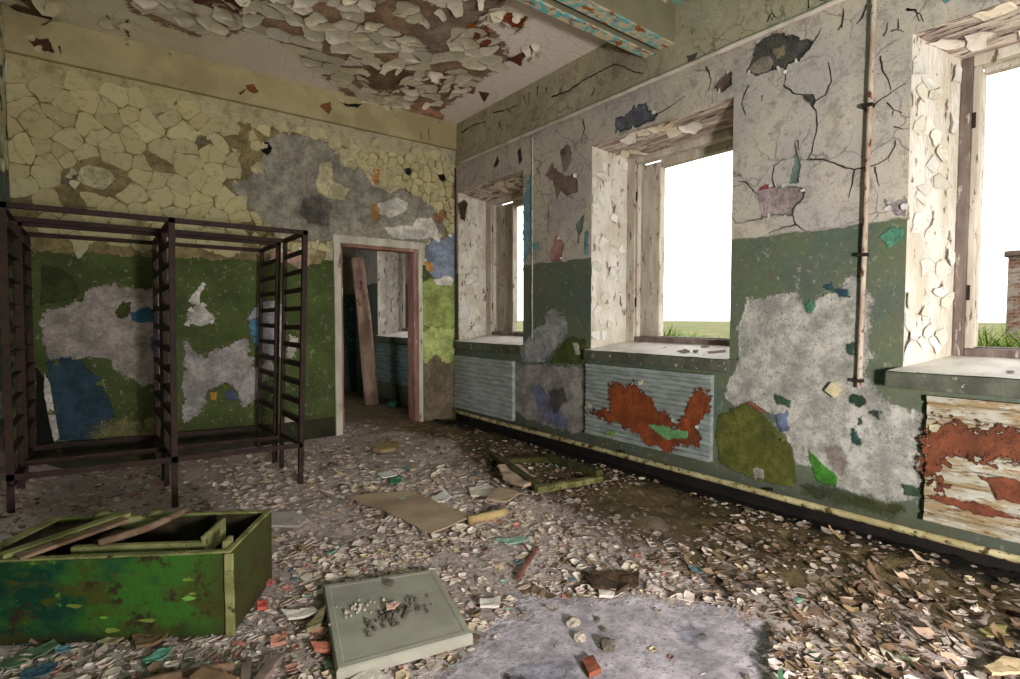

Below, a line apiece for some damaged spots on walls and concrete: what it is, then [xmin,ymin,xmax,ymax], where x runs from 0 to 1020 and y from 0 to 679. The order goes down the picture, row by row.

crack [808,0,867,41]
peeling [0,0,542,445]
peeling [545,145,578,199]
spalling [515,292,613,436]
peeling [576,161,628,284]
peeling [615,102,703,173]
crack [732,215,806,234]
spalling [679,275,925,503]
crack [738,8,924,198]
peeling [879,112,959,249]
peeling [904,292,948,362]
peeling [920,248,955,310]